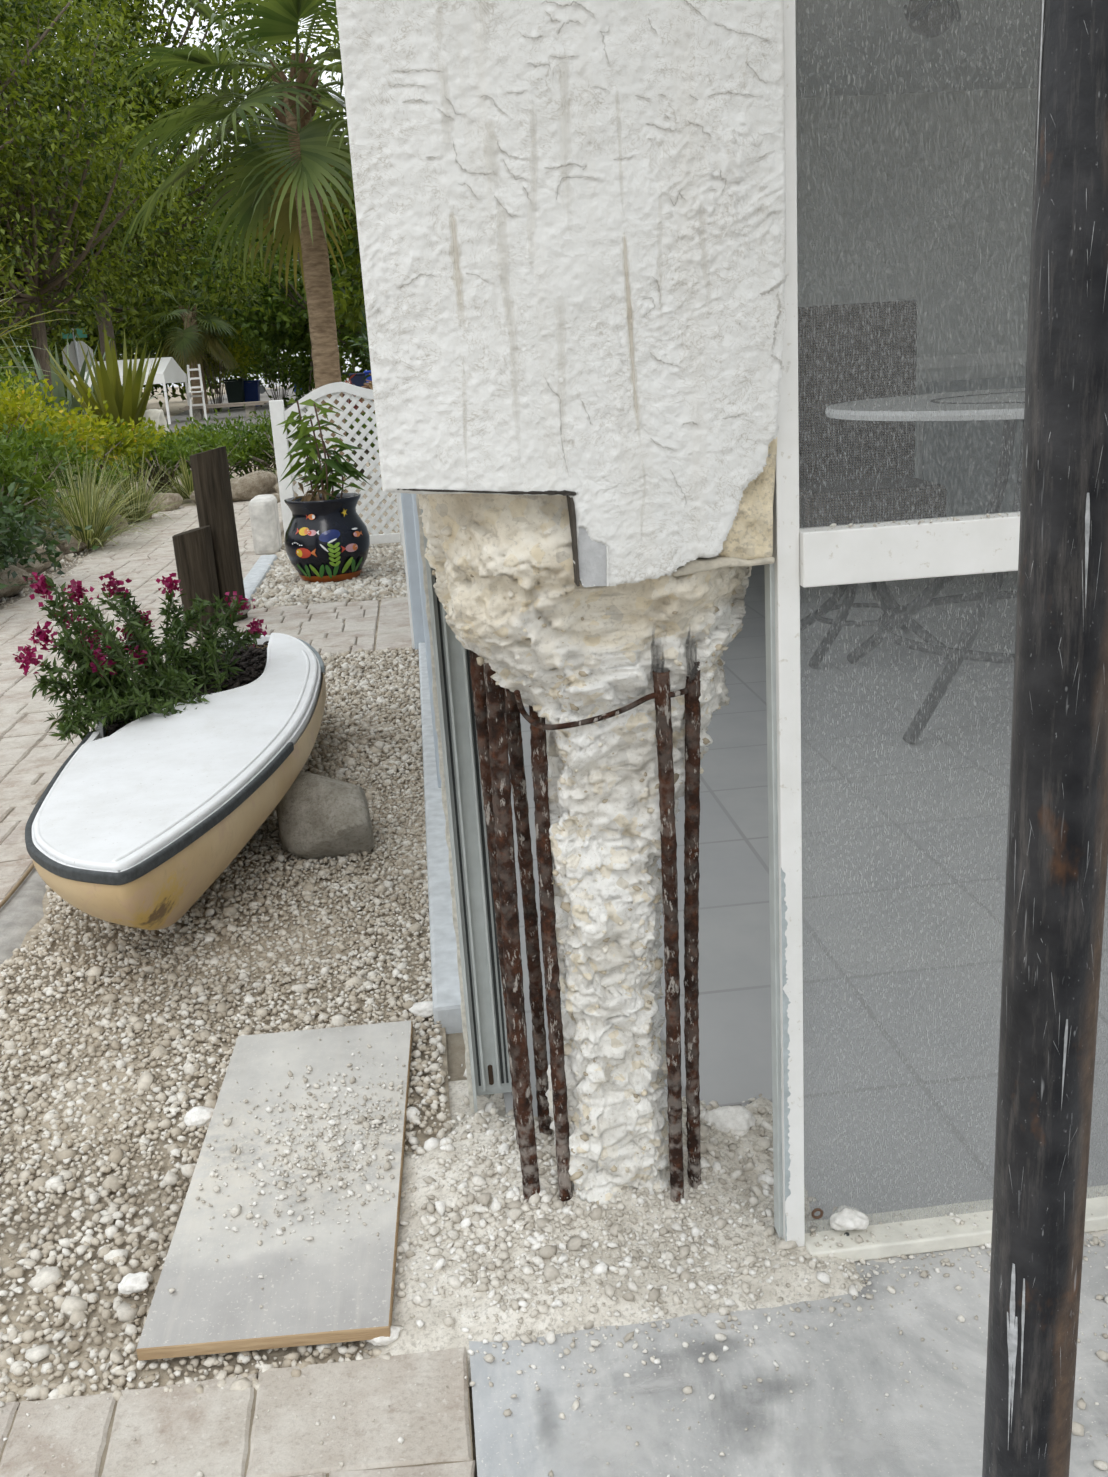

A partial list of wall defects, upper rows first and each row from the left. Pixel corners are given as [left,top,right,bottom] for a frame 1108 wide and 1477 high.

crack [397,489,580,587]
corrosion [651,636,664,673]
corrosion [686,628,697,680]
spalling [417,437,777,1206]